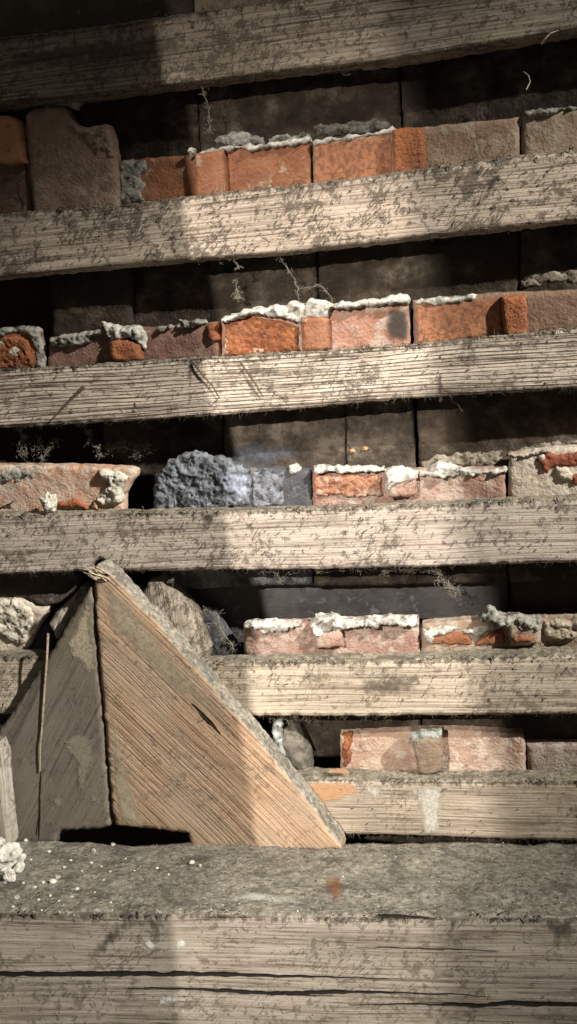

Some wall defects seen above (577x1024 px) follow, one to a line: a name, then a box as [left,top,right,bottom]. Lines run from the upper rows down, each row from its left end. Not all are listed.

crack [0,970,577,1007]